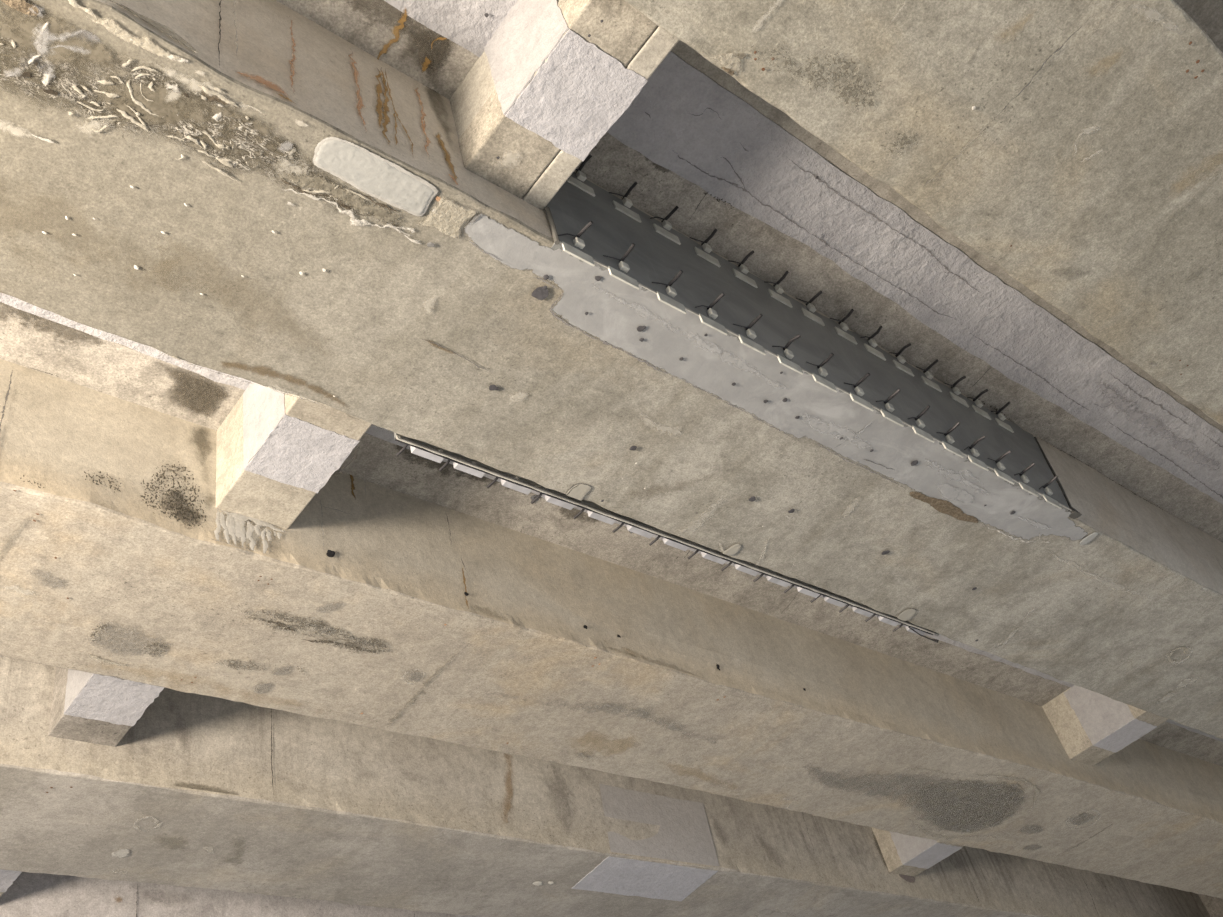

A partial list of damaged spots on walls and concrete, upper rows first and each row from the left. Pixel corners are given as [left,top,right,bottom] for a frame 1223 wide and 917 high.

water stain [0,0,112,86]
water stain [101,83,291,164]
rust [237,20,296,104]
water stain [348,0,450,76]
rust [349,9,458,185]
water stain [288,189,420,244]
crack [678,144,947,316]
crack [789,159,978,291]
crack [970,339,1223,498]
water stain [78,470,121,491]
water stain [140,461,284,553]
spalling [910,492,979,523]